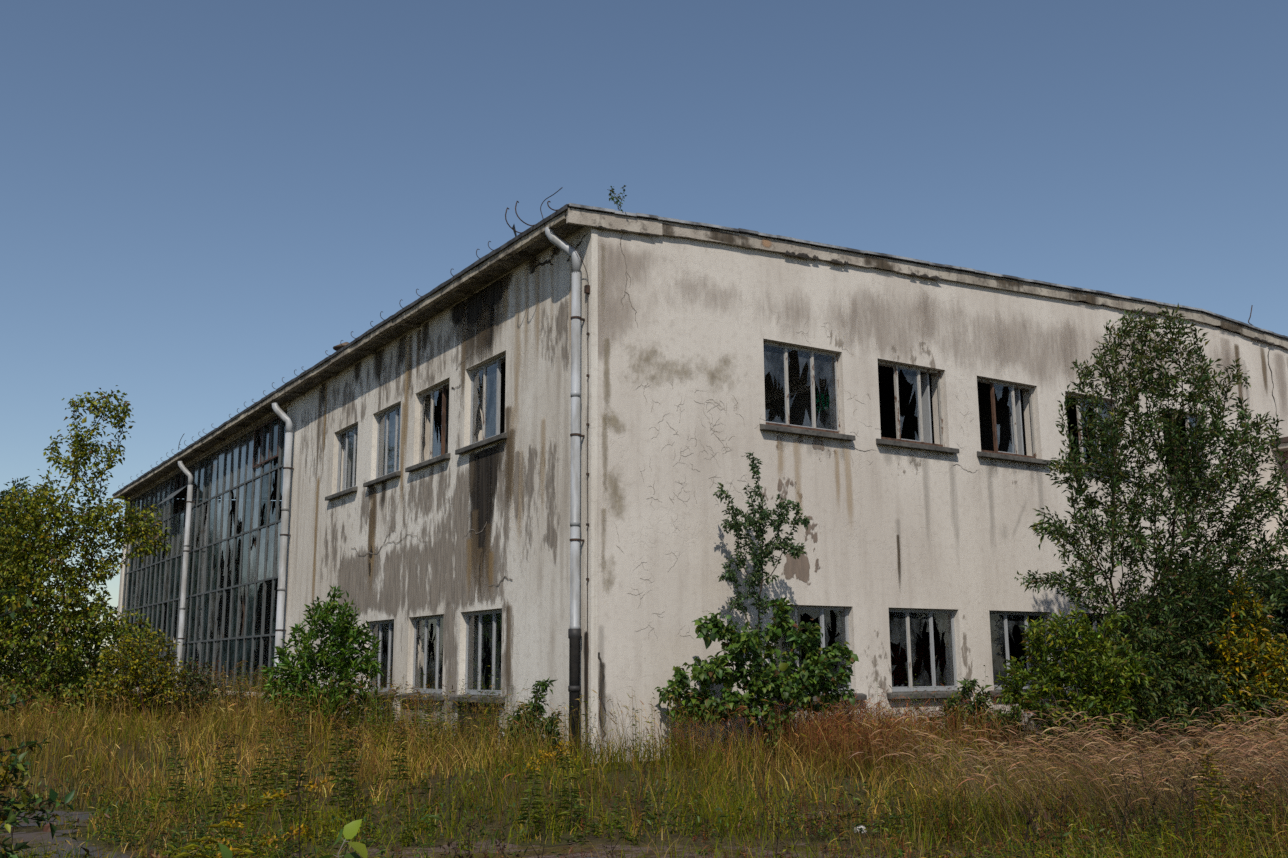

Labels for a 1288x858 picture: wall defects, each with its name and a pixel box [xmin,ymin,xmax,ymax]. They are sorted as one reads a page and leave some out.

leakage [354,336,405,382]
leakage [451,273,512,390]
leakage [1226,339,1243,407]
leakage [1261,350,1285,399]
leakage [468,407,519,589]
crack [613,379,768,641]
peeling [761,479,820,585]